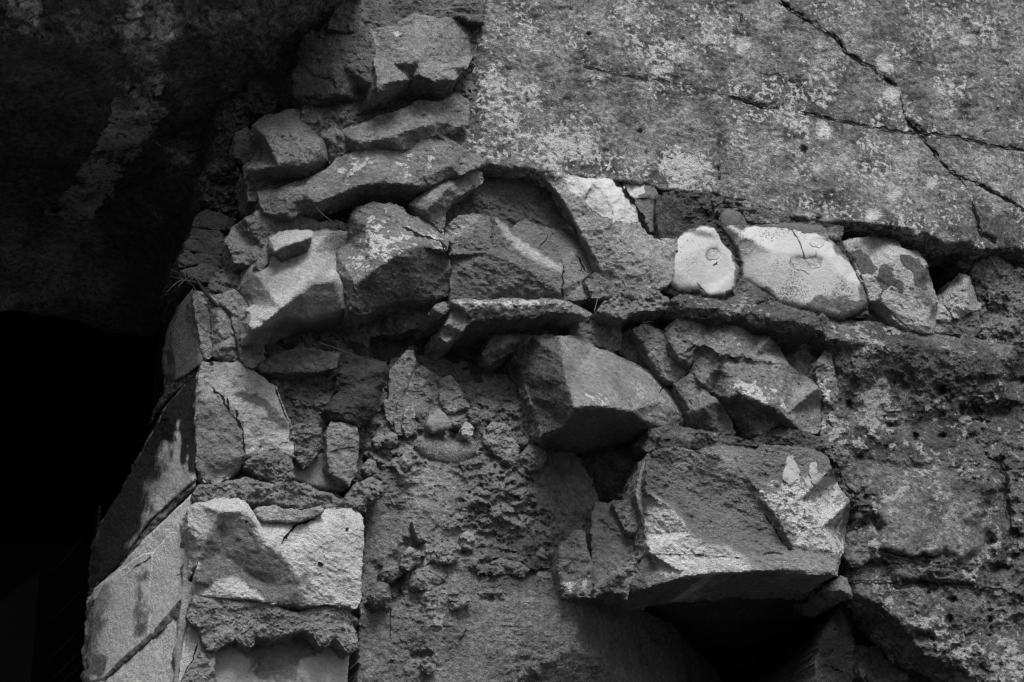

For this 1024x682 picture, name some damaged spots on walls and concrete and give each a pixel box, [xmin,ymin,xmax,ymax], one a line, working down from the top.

crack [574,0,1024,243]
peeling [585,187,613,219]
spalling [266,229,313,266]
peeling [738,239,754,253]
peeling [748,222,825,274]
crack [211,386,246,459]
peeling [376,350,416,439]
spalling [611,441,850,613]